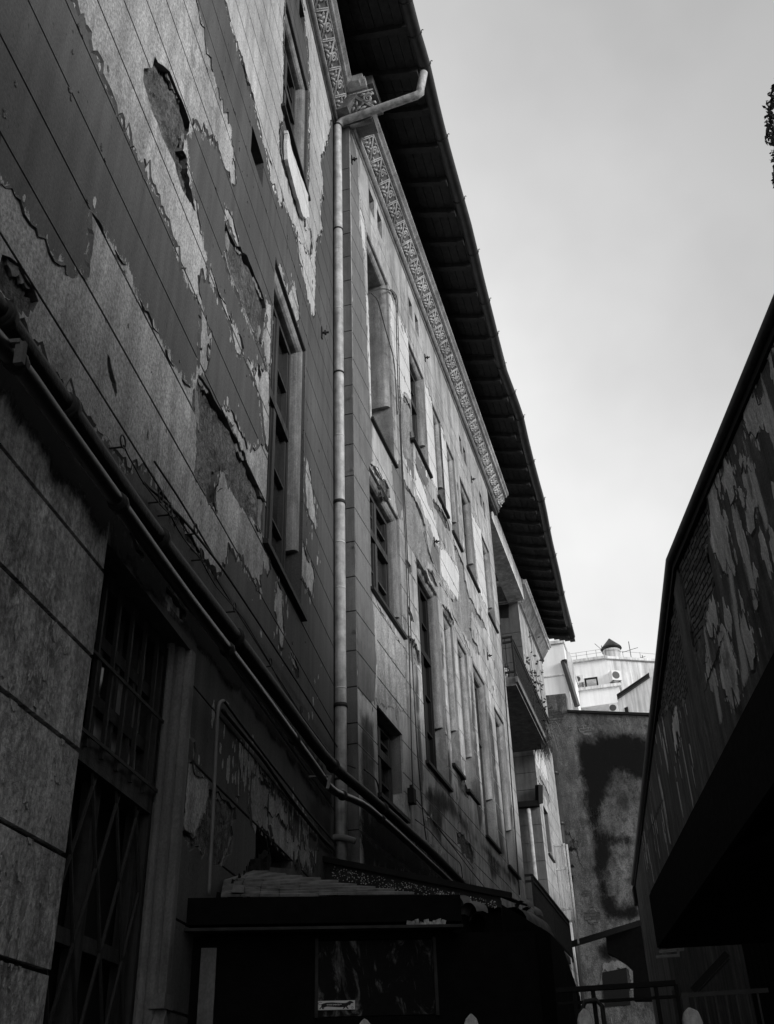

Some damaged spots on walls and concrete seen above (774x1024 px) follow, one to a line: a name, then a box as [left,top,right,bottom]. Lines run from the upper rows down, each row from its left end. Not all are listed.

peeling [224,0,333,322]
peeling [0,0,306,679]
peeling [302,454,325,606]
peeling [705,385,774,714]
peeling [182,702,319,876]